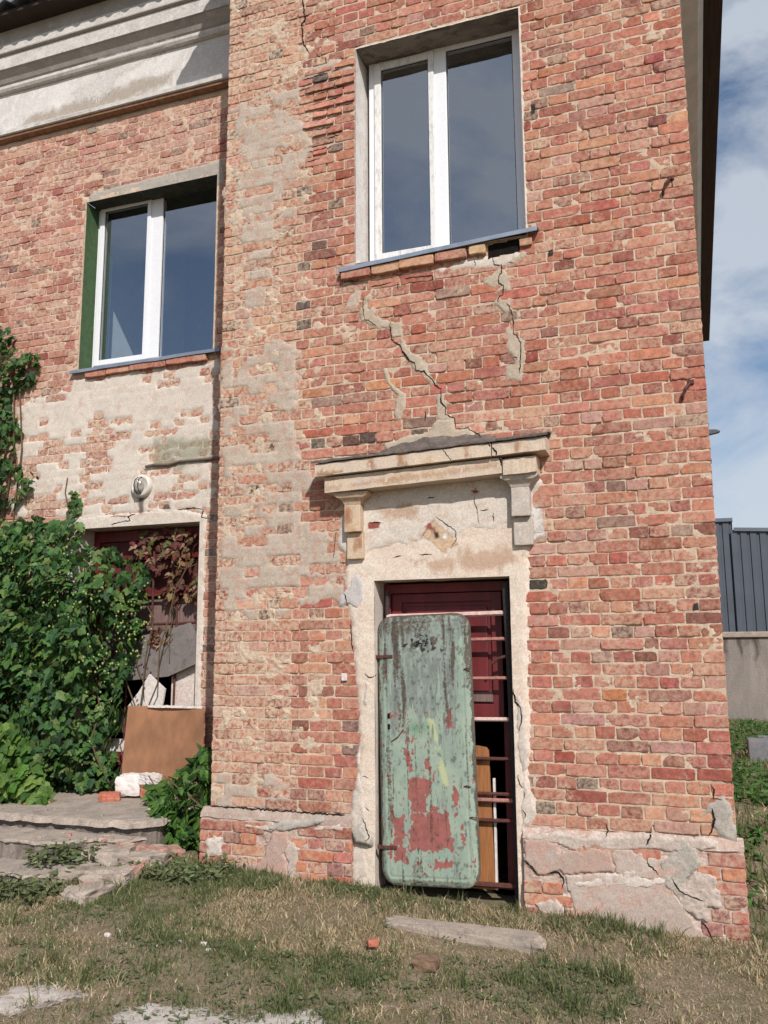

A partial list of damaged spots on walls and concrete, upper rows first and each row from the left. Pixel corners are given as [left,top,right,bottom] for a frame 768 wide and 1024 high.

crack [300,0,351,162]
flaking render [222,59,358,332]
crack [358,275,503,467]
crack [474,251,530,384]
peeling [11,339,347,621]
flaking render [422,520,458,552]
crack [396,497,494,557]
flaking render [224,831,290,877]
crack [525,861,564,888]
crack [646,830,713,939]